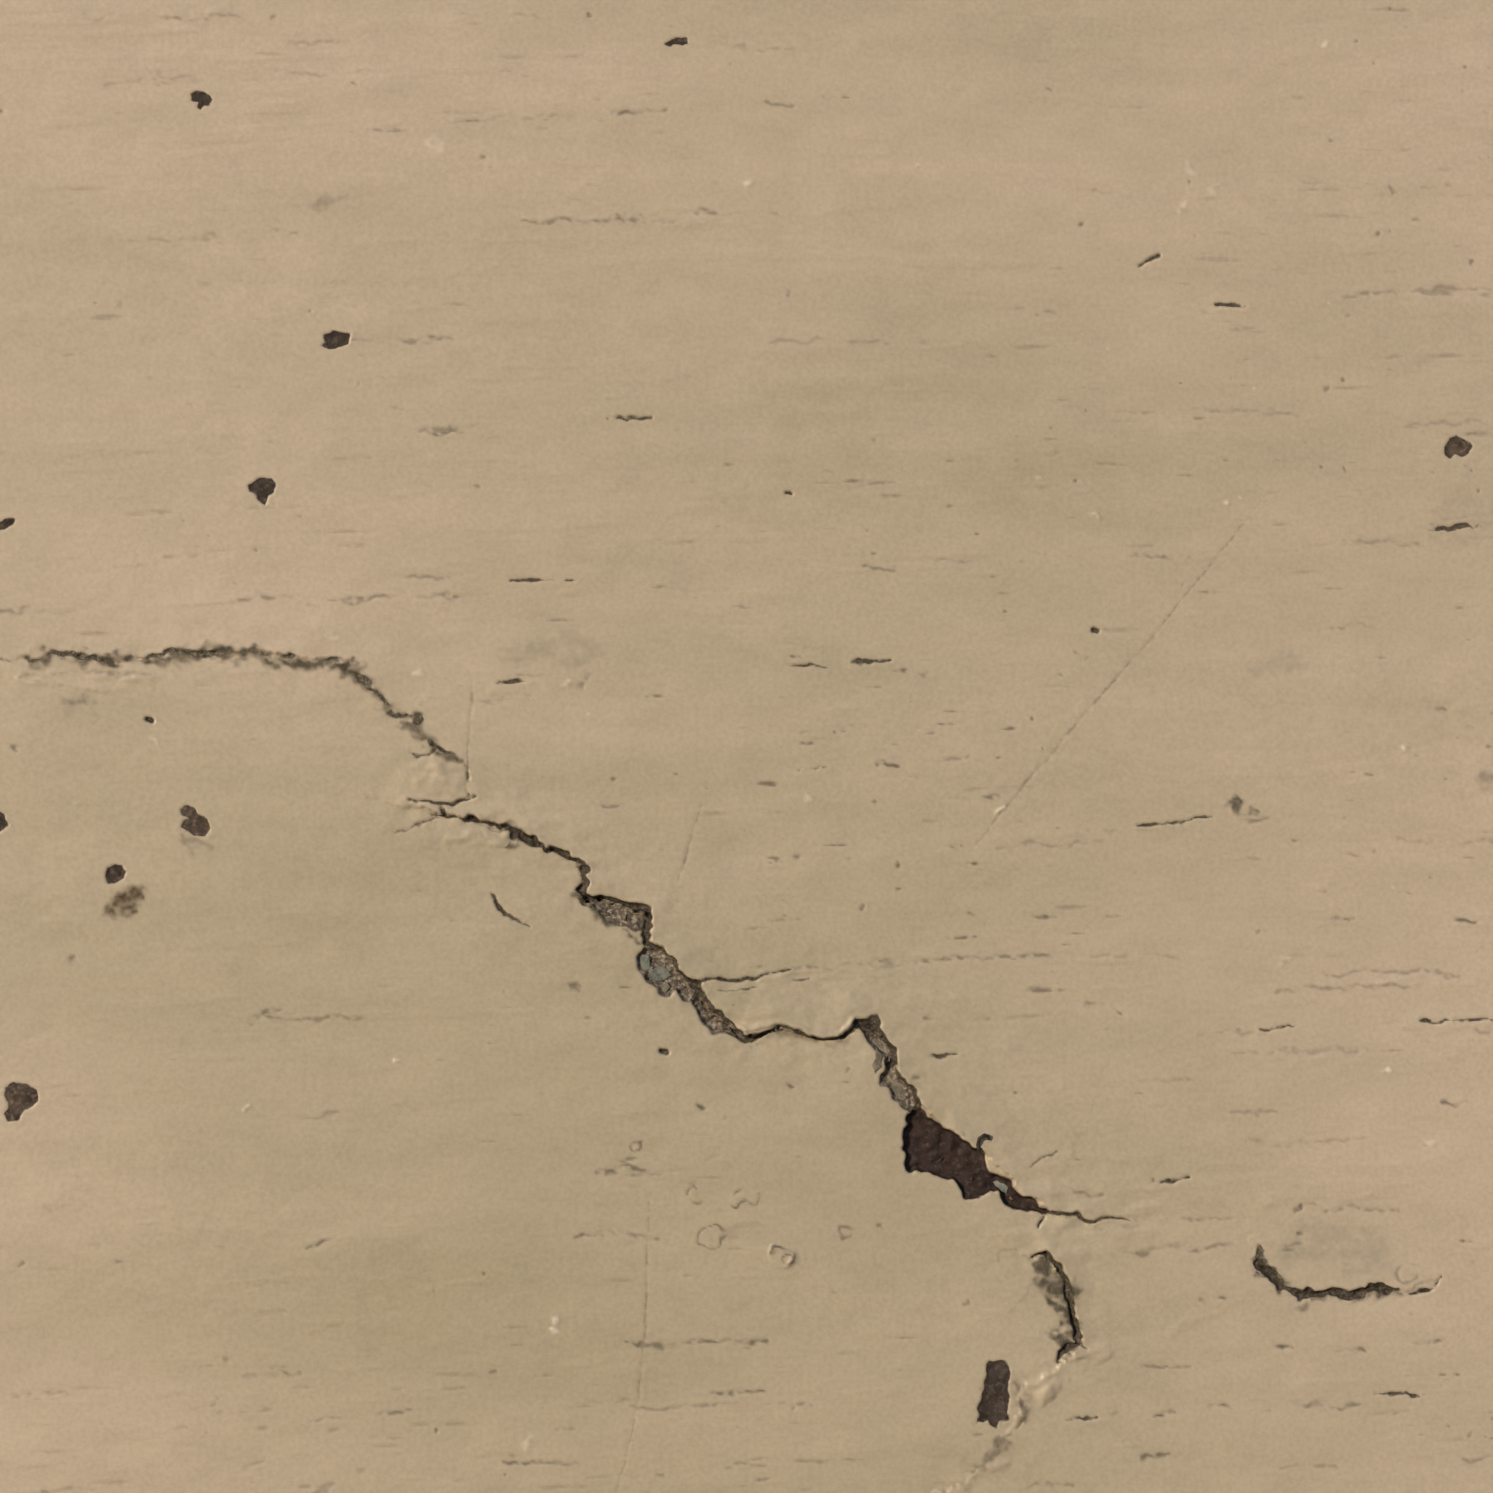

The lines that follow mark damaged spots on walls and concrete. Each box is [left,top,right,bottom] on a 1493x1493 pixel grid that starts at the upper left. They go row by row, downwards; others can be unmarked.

peeling [1444,436,1472,458]
peeling [248,478,276,505]
peeling [181,805,210,836]
crack [25,646,1124,1363]
peeling [4,1082,38,1121]
crack [1253,1246,1438,1301]
peeling [977,1360,1010,1428]